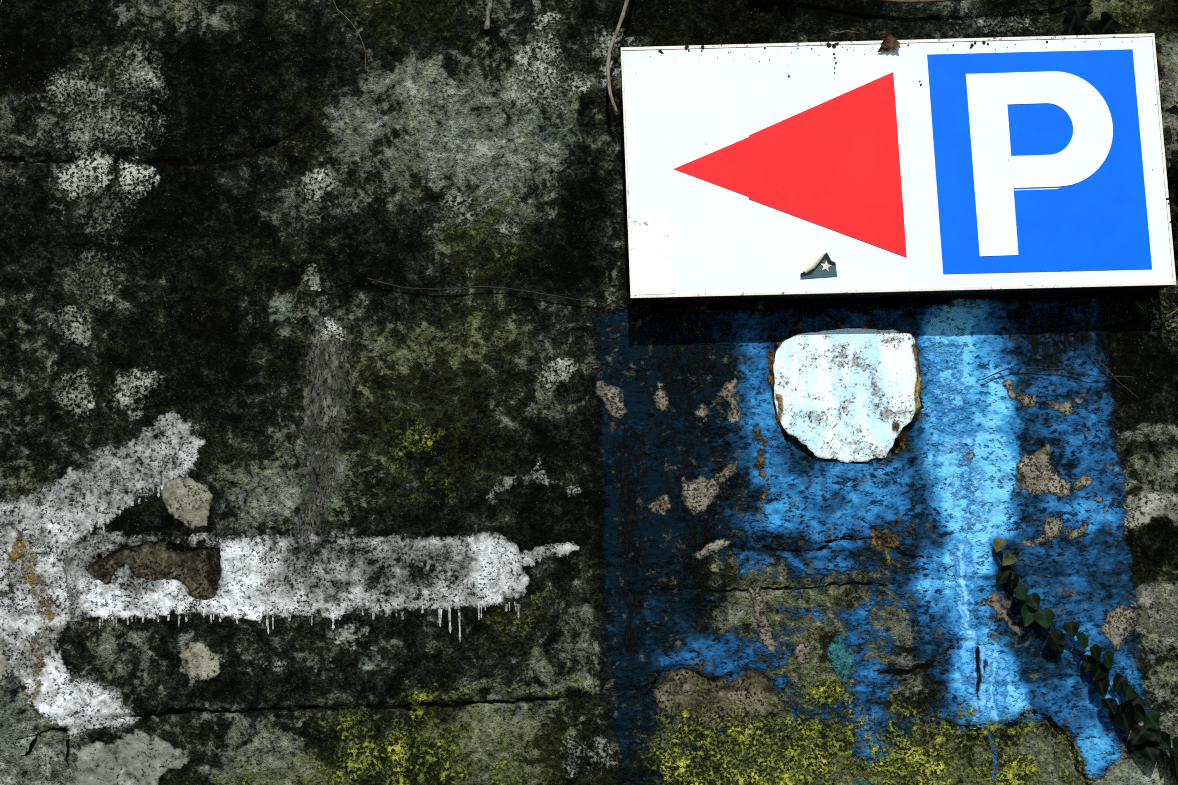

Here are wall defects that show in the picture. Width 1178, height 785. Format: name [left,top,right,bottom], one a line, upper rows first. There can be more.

crack [0,151,78,165]
crack [113,123,306,166]
spalling [595,381,627,418]
spalling [646,461,738,515]
spalling [1016,442,1093,497]
spalling [1020,516,1090,547]
peeling [1101,584,1178,650]
crack [119,696,578,719]
crack [606,667,744,709]
spalling [651,665,792,729]
crack [12,728,70,766]